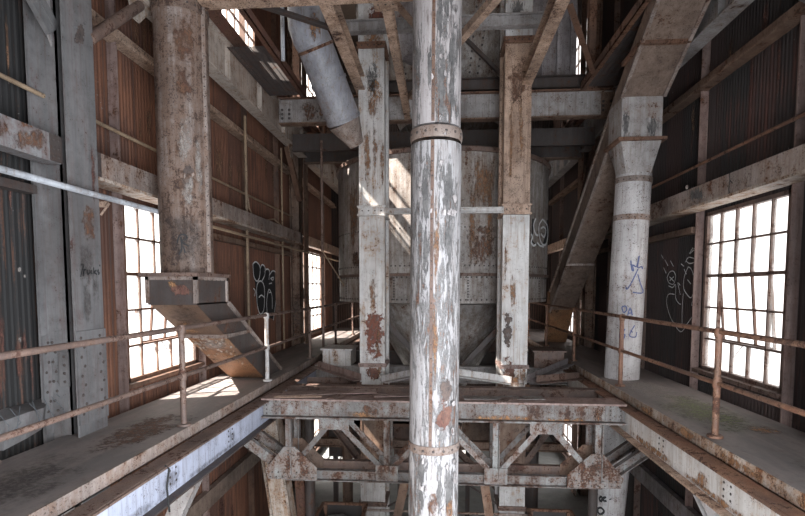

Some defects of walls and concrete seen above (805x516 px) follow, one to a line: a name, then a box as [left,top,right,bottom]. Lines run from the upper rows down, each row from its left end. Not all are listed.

rust [173,15,194,61]
rust [0,123,46,149]
rust [82,153,95,239]
peeling [418,157,457,276]
rust [467,161,495,265]
peeling [435,378,456,436]
peeling [418,458,458,516]
rust [687,472,741,516]